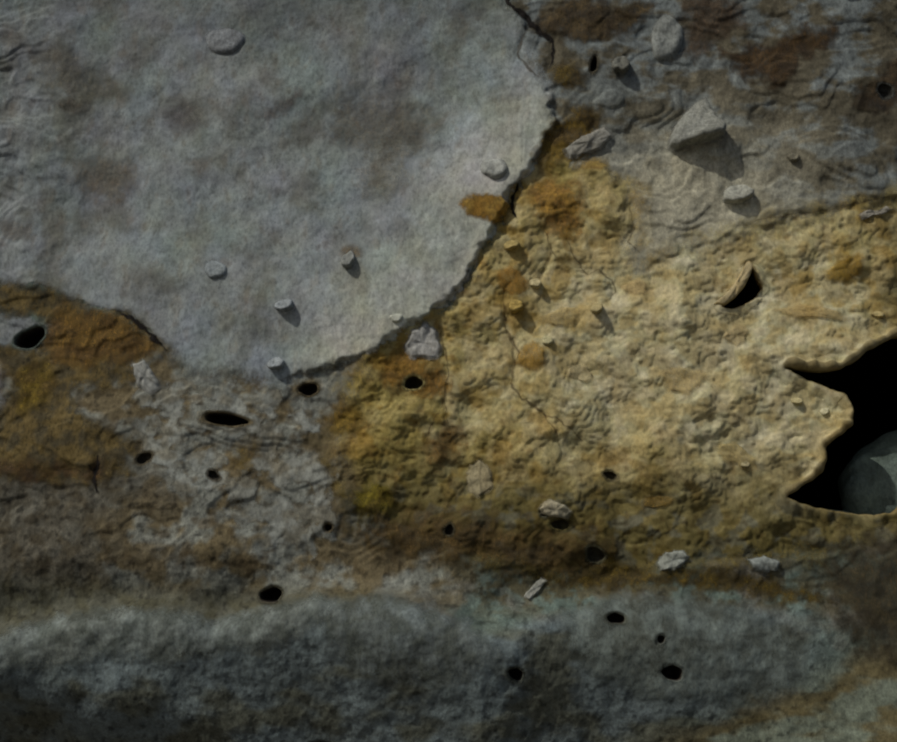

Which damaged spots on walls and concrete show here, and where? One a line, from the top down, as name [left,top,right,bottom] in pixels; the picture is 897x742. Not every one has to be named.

crack [505,0,555,74]
spalling [131,127,897,599]